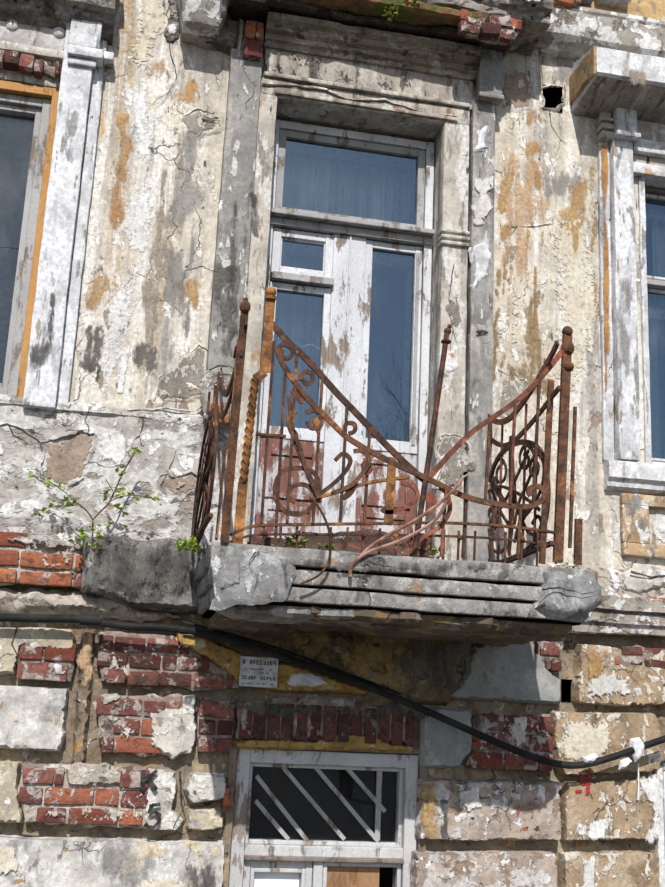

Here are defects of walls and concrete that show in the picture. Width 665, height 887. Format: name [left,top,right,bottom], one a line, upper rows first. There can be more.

crack [149,43,179,108]
peeling [180,107,225,139]
peeling [502,66,566,114]
leakage [79,0,205,393]
leakage [493,171,599,394]
leakage [29,292,55,366]
peeling [149,342,232,428]
crack [0,422,74,489]
spalling [608,491,665,600]
flaking render [0,531,240,828]
flaking render [529,641,572,702]
flaking render [588,646,665,698]